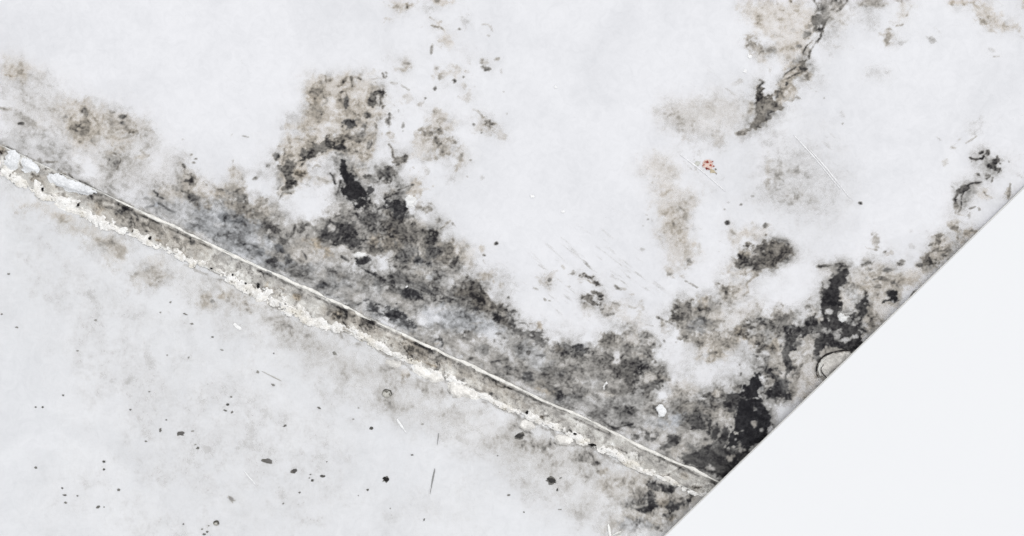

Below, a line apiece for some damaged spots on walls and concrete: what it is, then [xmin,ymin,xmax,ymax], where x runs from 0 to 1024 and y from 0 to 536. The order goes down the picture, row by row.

damp [745,0,798,62]
damp [827,0,908,46]
damp [950,0,1020,32]
damp [0,59,1010,482]
damp [478,400,701,536]